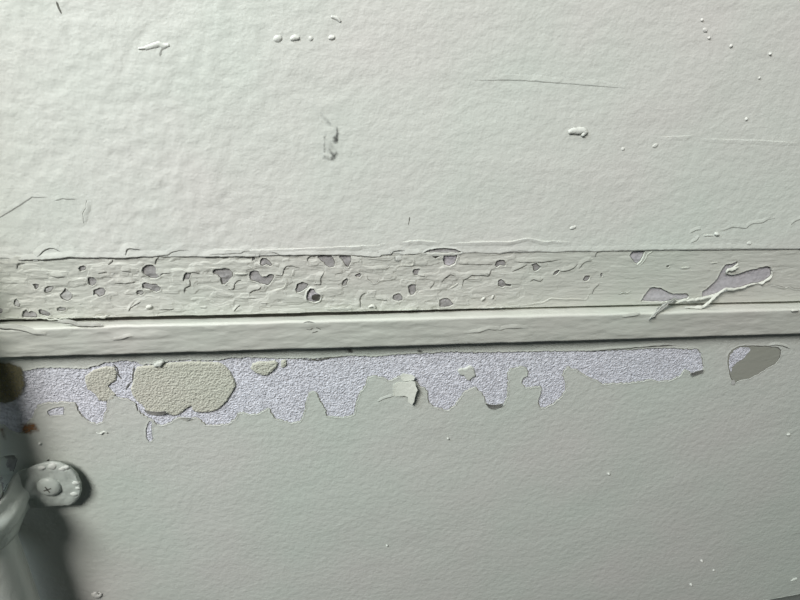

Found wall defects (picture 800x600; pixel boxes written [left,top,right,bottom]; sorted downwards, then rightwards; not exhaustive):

peeling [10,243,62,269]
peeling [0,270,74,319]
peeling [77,258,113,298]
peeling [114,257,171,311]
peeling [178,267,200,293]
peeling [207,245,604,311]
peeling [640,260,800,303]
peeling [726,344,782,385]
peeling [0,346,706,443]